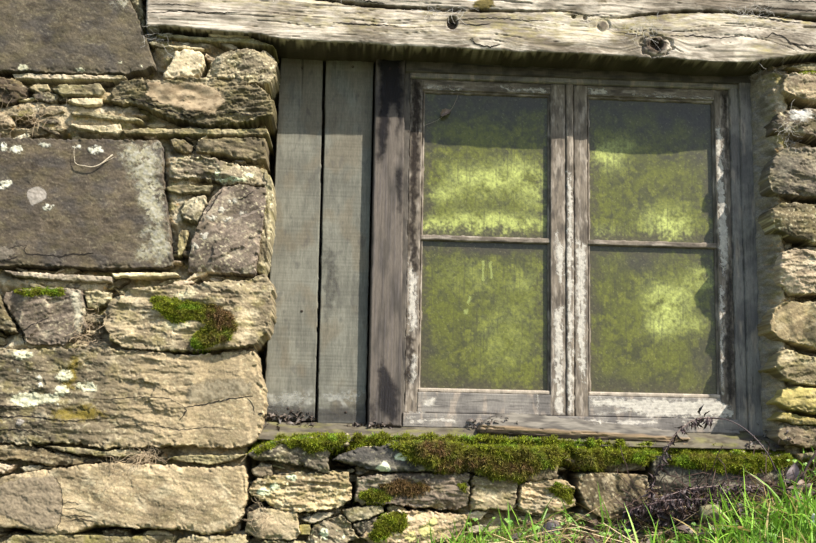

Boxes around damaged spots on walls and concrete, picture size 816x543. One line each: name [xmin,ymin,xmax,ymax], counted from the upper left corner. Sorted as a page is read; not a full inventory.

damp [377,59,421,272]
peeling [716,127,728,275]
peeling [408,268,417,331]
peeling [553,171,586,414]
damp [406,336,414,382]
crack [0,396,255,433]
peeling [589,397,733,428]